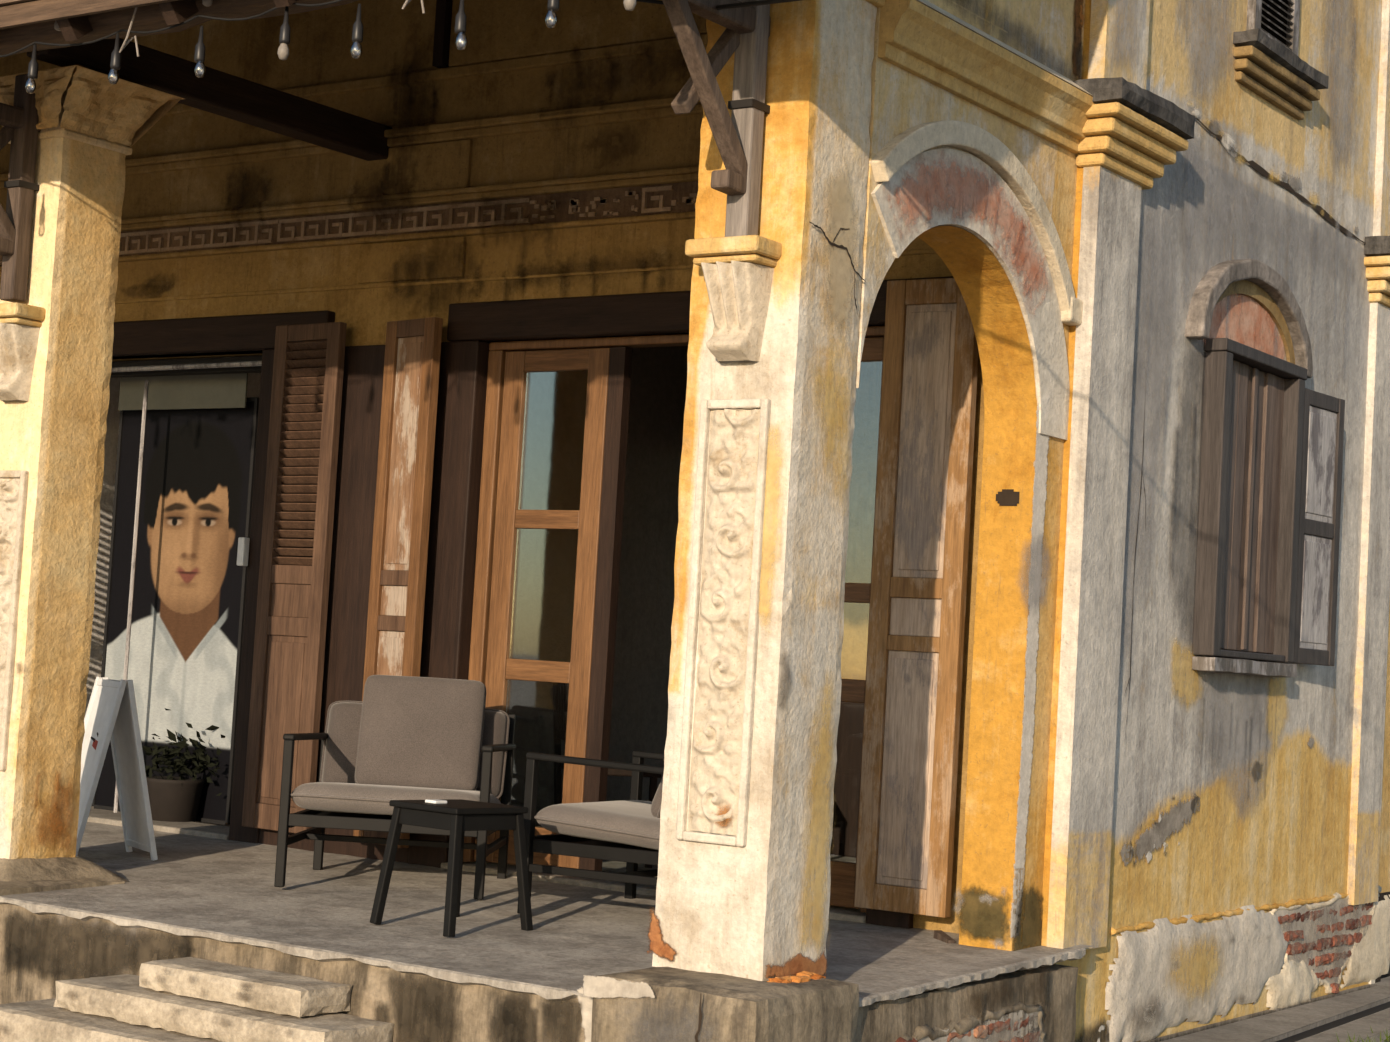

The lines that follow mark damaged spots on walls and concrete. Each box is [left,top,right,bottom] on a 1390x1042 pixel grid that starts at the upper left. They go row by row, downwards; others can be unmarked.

crack [809,222,866,317]
damp [1120,228,1206,650]
peeling [1121,794,1200,866]
flaking render [1110,885,1382,994]
flaking render [894,1001,1046,1042]